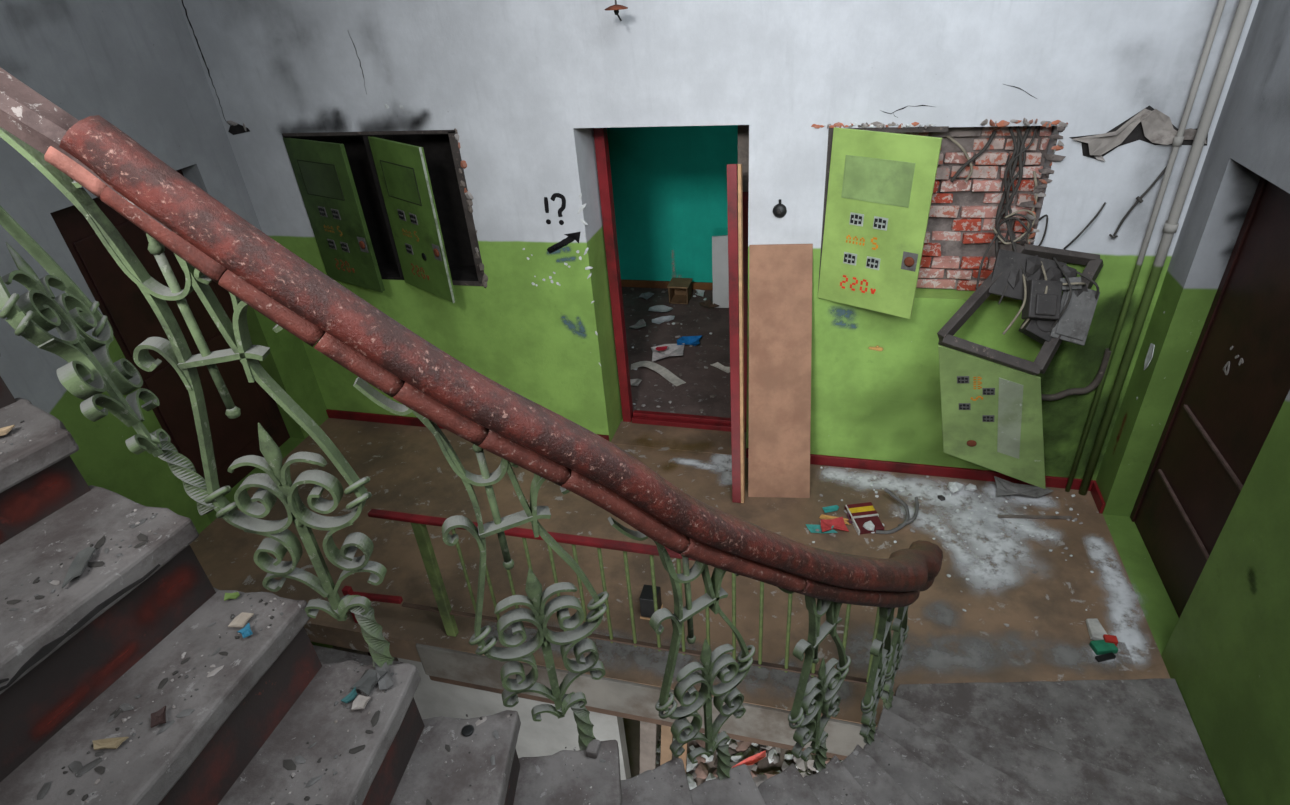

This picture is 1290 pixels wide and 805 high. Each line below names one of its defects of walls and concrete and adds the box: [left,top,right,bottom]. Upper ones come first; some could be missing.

spalling [811,105,1208,291]